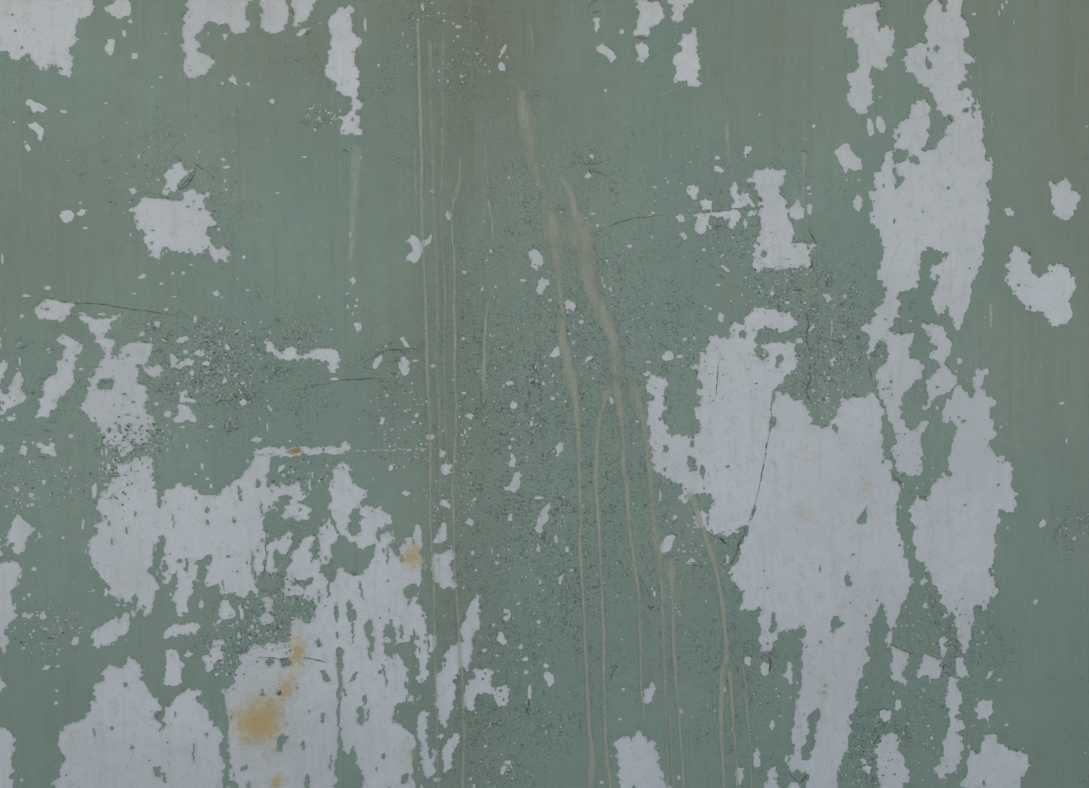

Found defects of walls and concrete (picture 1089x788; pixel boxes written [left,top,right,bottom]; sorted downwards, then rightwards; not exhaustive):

peeling [0,0,132,79]
peeling [180,0,367,136]
peeling [106,138,245,285]
peeling [405,234,433,263]
peeling [1004,245,1077,327]
peeling [0,249,667,788]
water stain [416,21,466,788]
water stain [518,91,685,788]
crack [693,388,777,569]
peeling [636,0,1034,788]
water stain [688,494,753,788]
peeling [611,731,682,788]